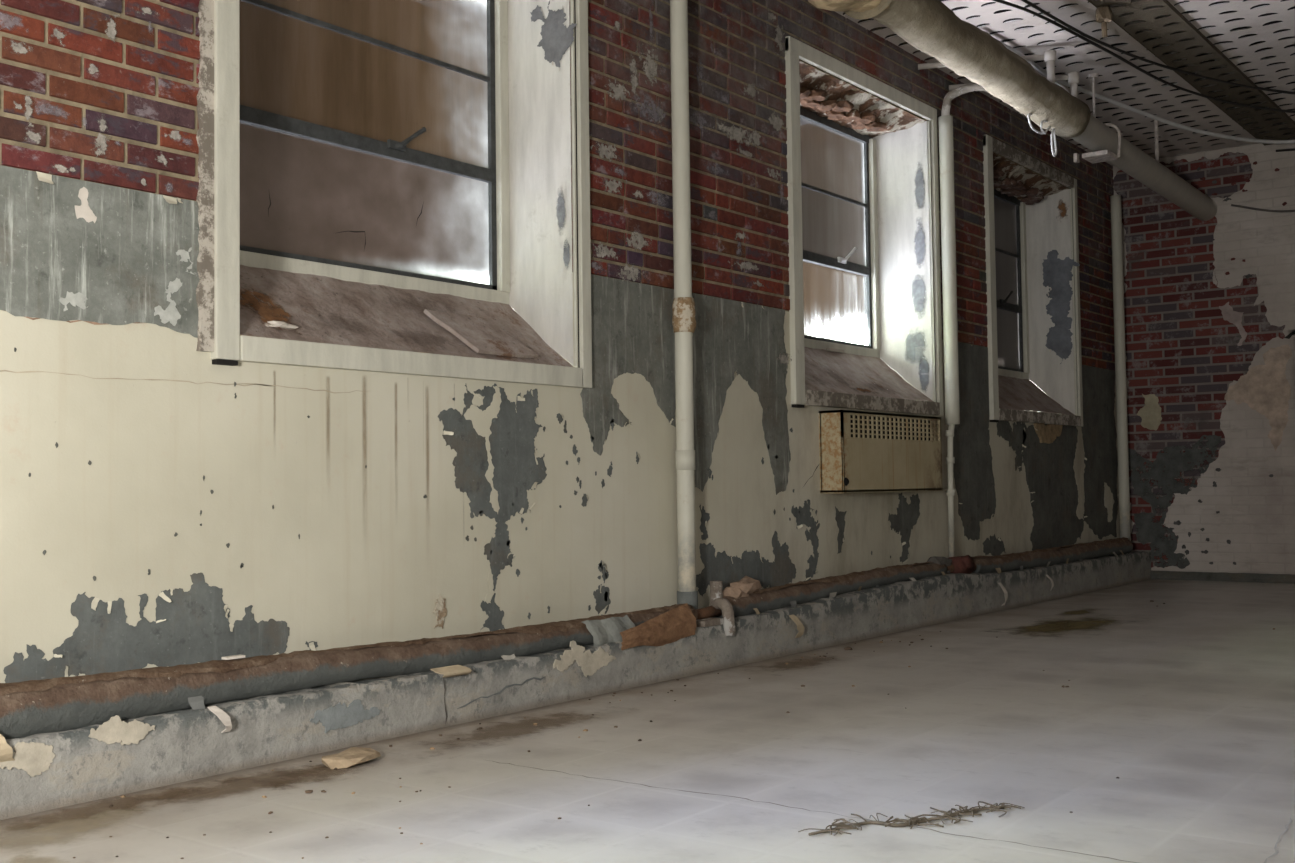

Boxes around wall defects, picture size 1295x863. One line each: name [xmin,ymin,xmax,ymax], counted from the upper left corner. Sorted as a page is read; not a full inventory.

peeling [530,1,576,71]
peeling [1159,152,1257,202]
peeling [0,165,199,338]
peeling [953,170,1285,569]
peeling [438,274,676,632]
peeling [692,293,847,597]
peeling [3,573,290,683]
corrosion [433,595,447,629]
damp [1022,618,1113,633]
peeling [207,706,232,733]
crack [488,760,872,821]
crack [909,826,1138,863]